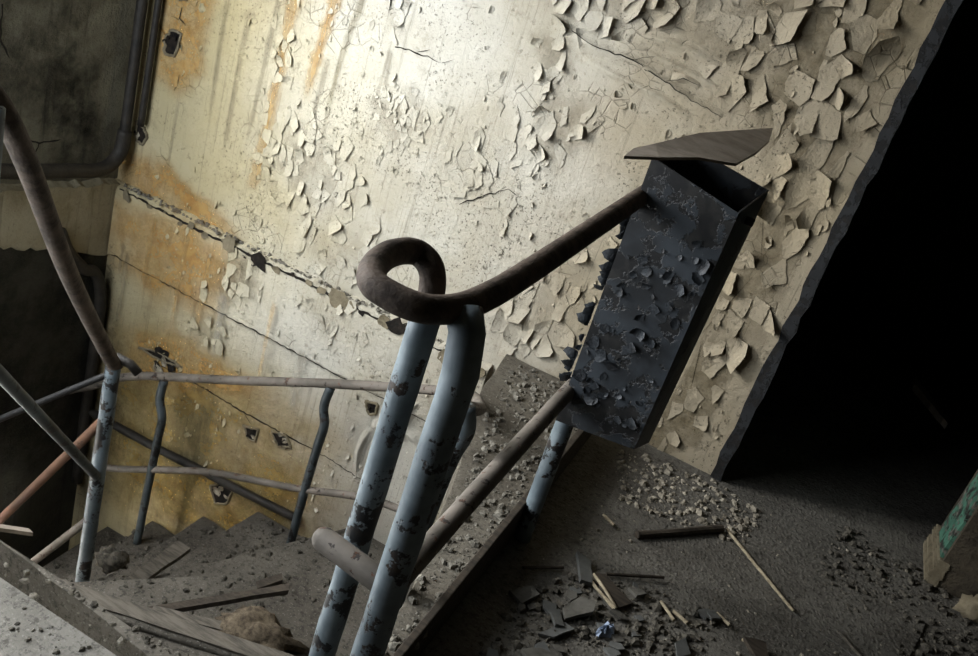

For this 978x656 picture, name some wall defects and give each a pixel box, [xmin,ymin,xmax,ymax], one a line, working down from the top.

spalling [162,24,205,58]
corrosion [310,0,337,81]
corrosion [265,48,285,129]
spalling [134,120,149,146]
peeling [228,0,454,288]
peeling [388,0,922,452]
peeling [190,247,264,324]
spalling [138,340,183,372]
peeling [182,310,240,389]
peeling [274,293,357,360]
spalling [338,391,381,425]
water stain [114,380,303,530]